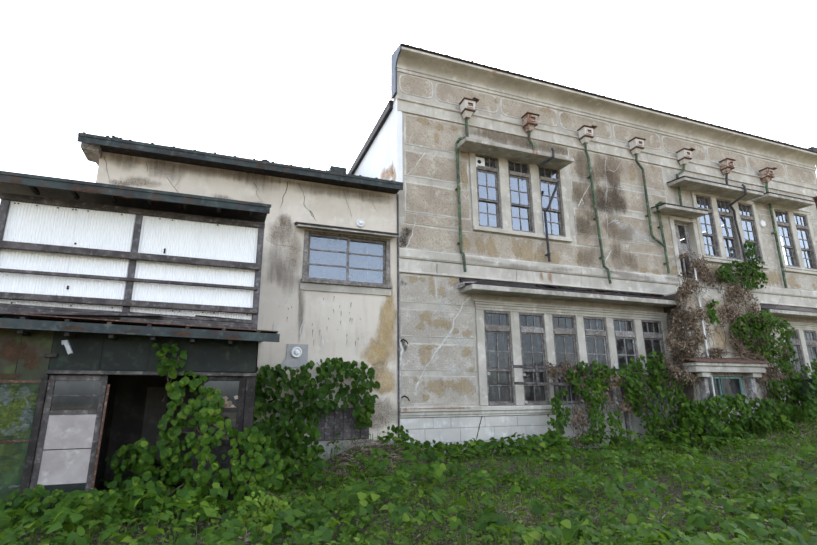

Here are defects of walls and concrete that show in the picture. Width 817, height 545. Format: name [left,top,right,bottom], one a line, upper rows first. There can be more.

crack [254,182,317,223]
water stain [575,159,651,267]
corrosion [13,313,278,338]
water stain [365,278,396,393]
crack [399,277,471,398]